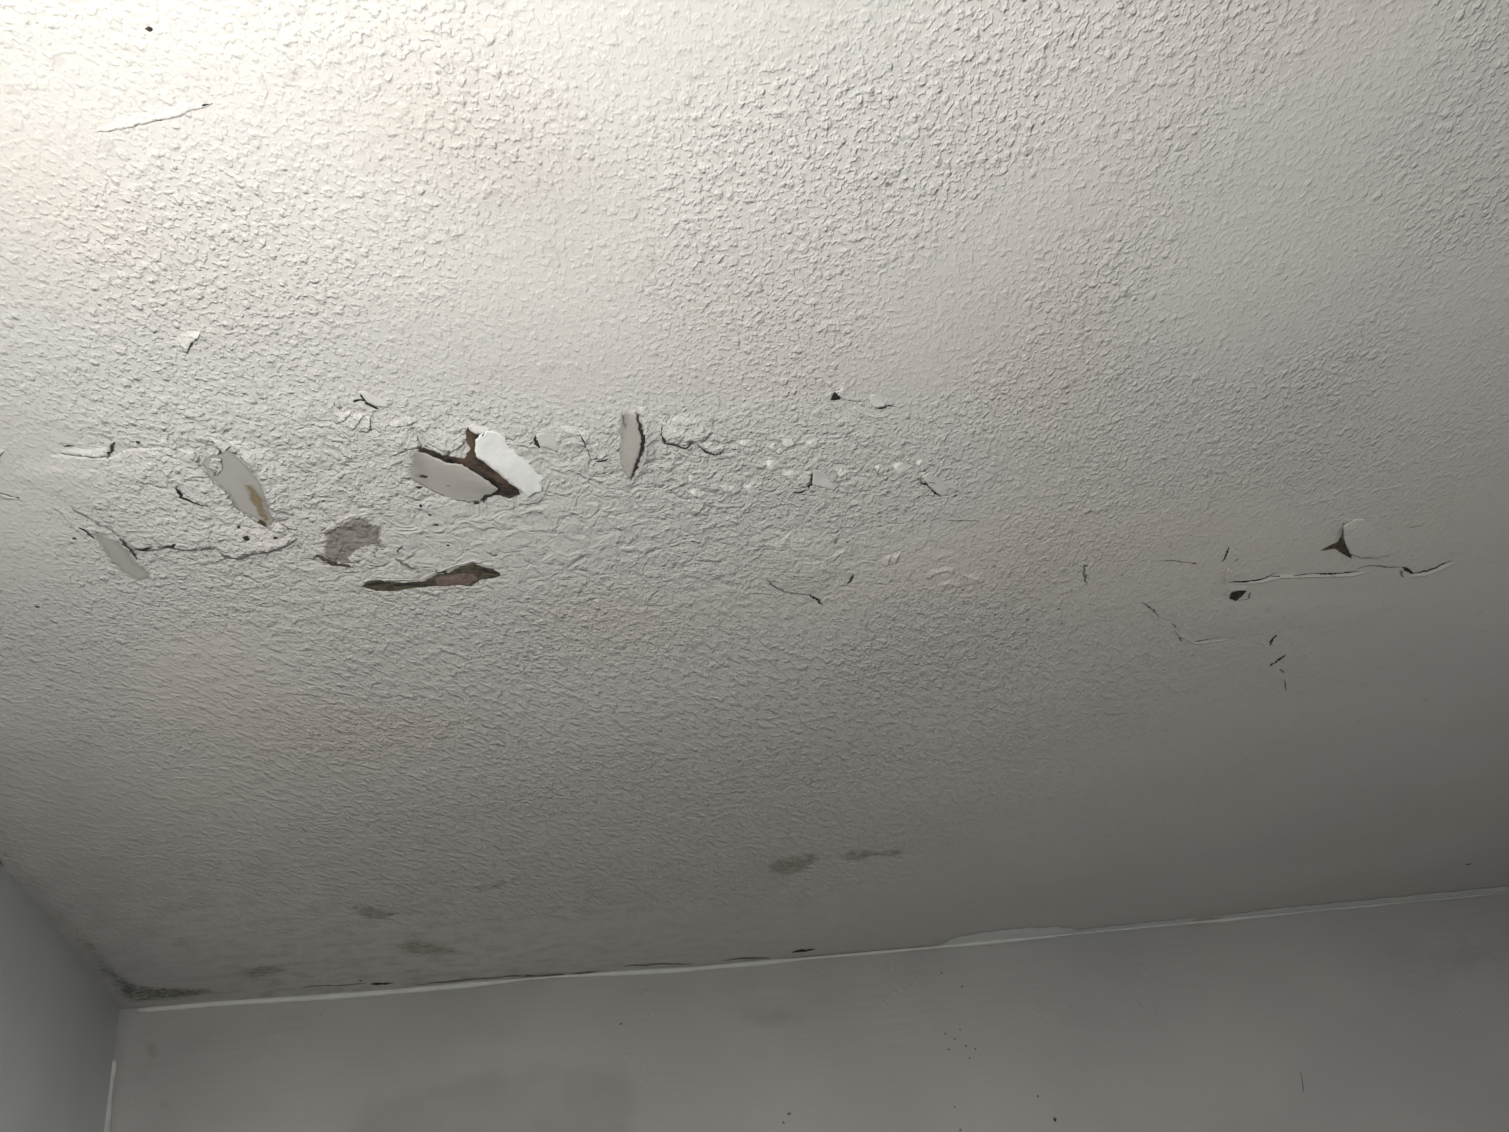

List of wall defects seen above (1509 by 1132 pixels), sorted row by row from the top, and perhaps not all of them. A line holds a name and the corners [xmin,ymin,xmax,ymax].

peeling [831,388,896,422]
peeling [10,440,302,579]
spalling [313,513,500,591]
peeling [415,406,661,526]
peeling [791,470,837,493]
peeling [1321,519,1393,559]
crack [1057,548,1456,689]